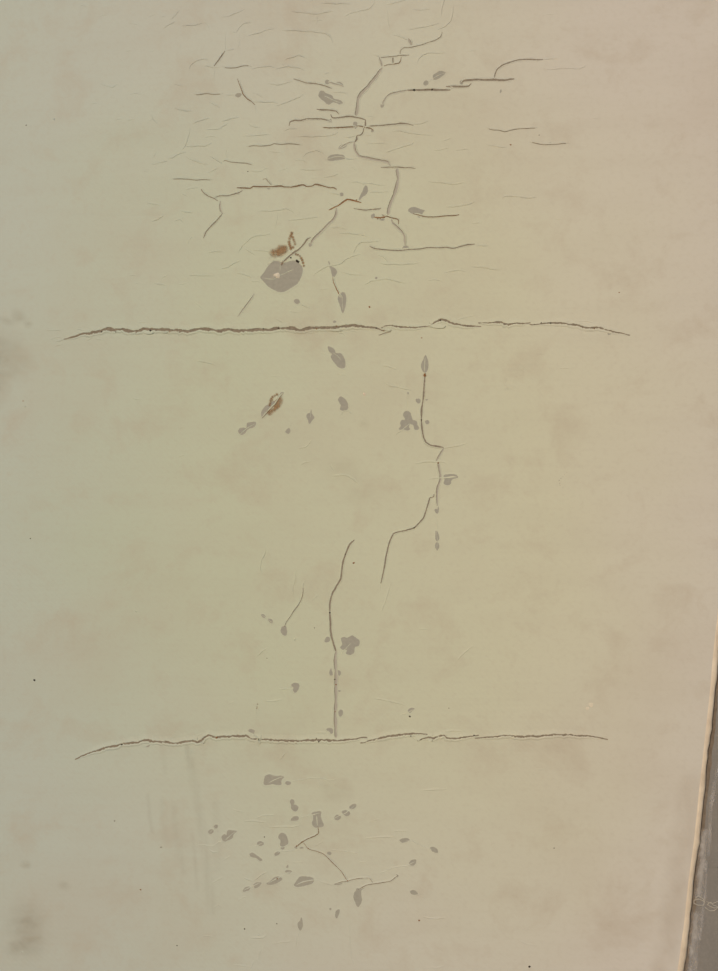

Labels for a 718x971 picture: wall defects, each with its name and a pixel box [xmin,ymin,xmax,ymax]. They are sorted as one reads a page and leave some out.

crack [46,0,630,346]
peeling [258,258,310,308]
peeling [395,397,431,436]
crack [379,373,467,591]
crack [74,539,608,760]
peeling [323,633,362,657]
peeling [241,797,358,893]
peeling [328,858,418,920]